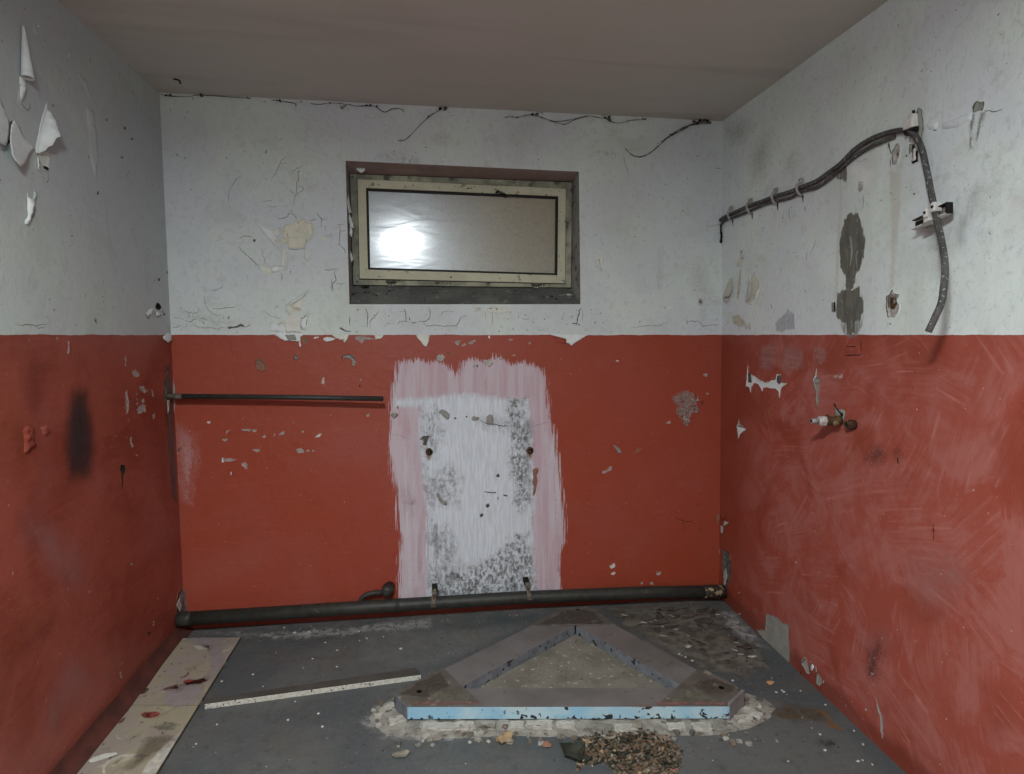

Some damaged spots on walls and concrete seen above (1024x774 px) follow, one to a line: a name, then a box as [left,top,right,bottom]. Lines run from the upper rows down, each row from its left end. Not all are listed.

peeling [17,24,40,111]
peeling [0,99,61,182]
peeling [24,191,37,227]
crack [263,157,346,290]
water stain [834,141,902,298]
crack [168,287,277,331]
crack [349,308,583,329]
peeling [550,334,587,346]
spalling [885,288,901,319]
peeling [744,364,788,402]
spalling [124,356,200,502]
peeling [666,389,709,427]